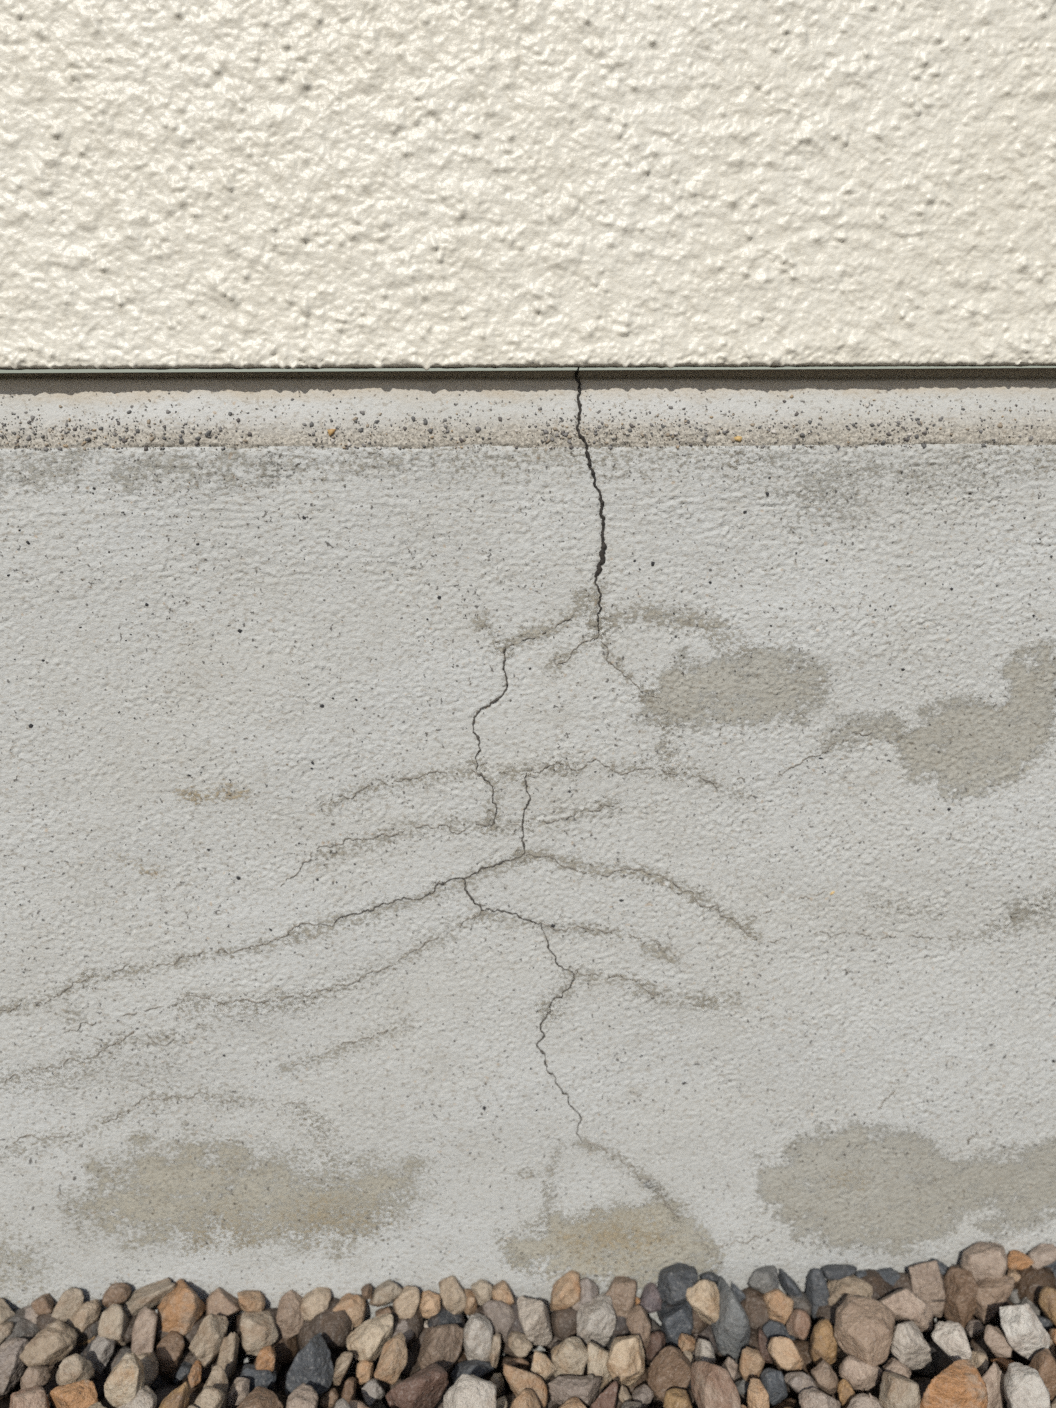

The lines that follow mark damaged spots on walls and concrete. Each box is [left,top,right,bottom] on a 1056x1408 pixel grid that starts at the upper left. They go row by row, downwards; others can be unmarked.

leakage [0,753,764,1265]
crack [0,367,954,1266]
leakage [469,580,1056,803]
leakage [750,1120,1056,1259]